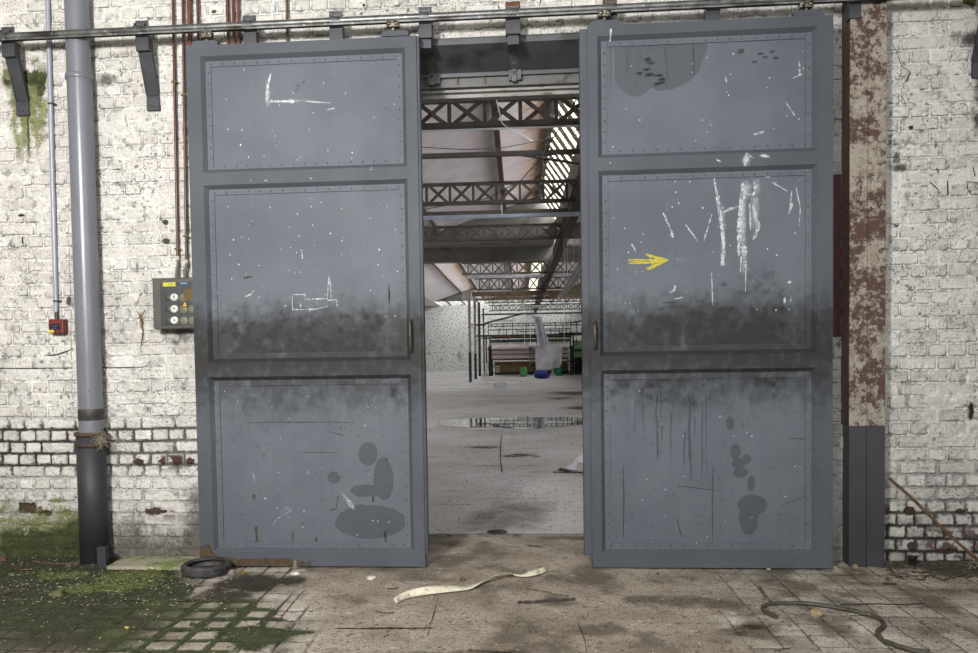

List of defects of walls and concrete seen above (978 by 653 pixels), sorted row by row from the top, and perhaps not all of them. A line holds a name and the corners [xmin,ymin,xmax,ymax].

leakage [12,100,47,156]